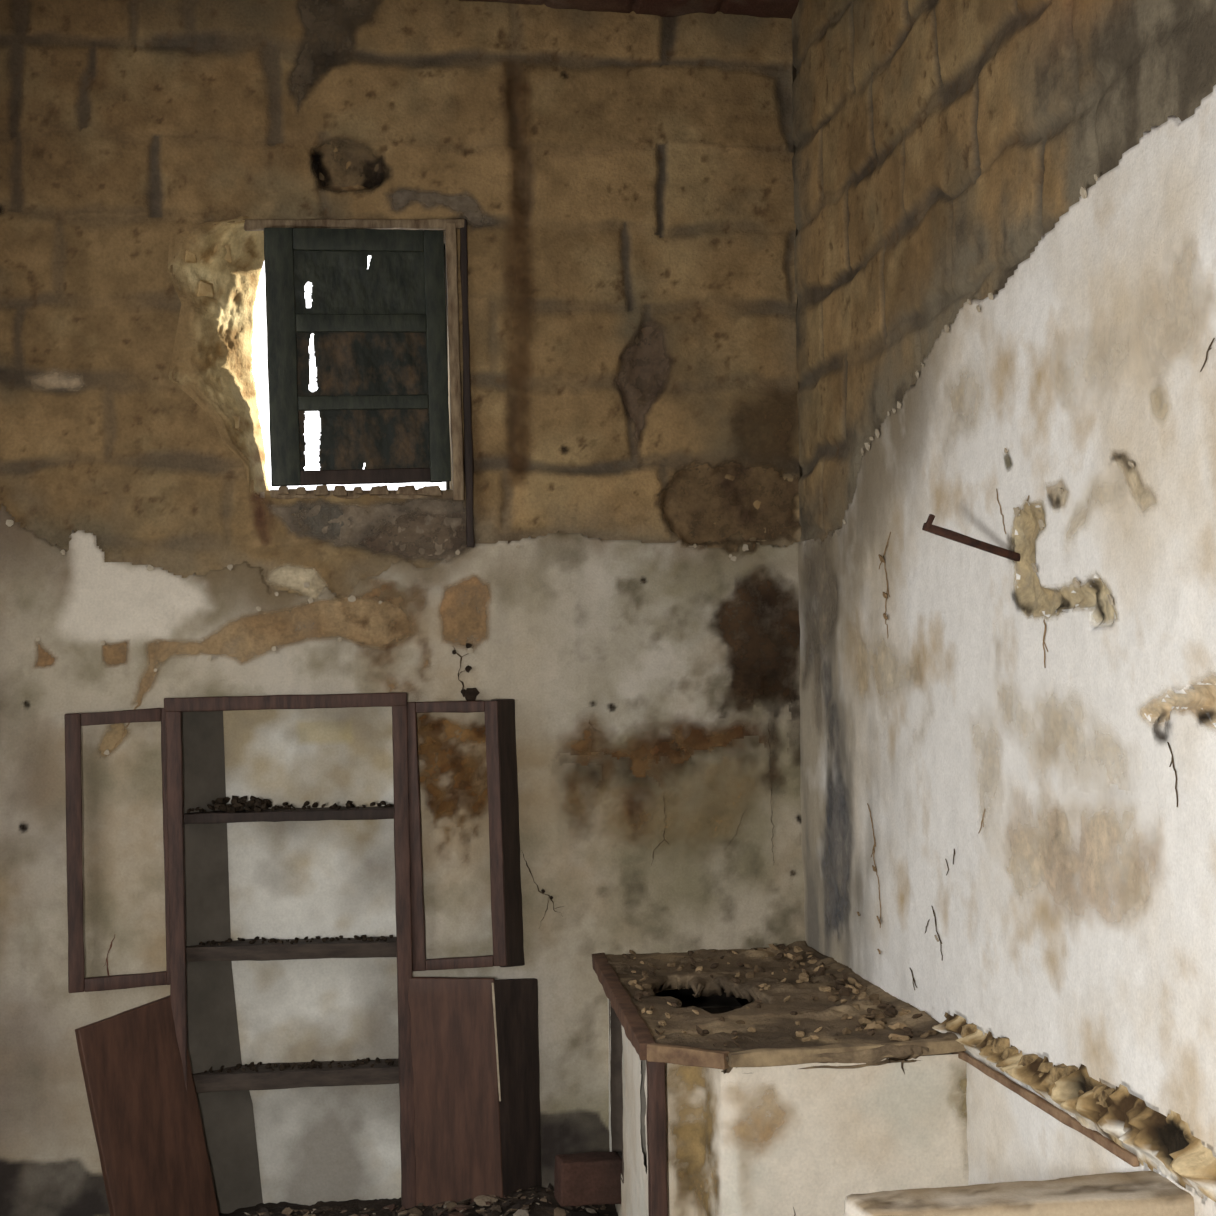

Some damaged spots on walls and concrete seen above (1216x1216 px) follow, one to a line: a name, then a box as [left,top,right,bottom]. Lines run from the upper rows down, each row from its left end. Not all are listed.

peeling [0,0,1216,758]
water stain [596,547,838,837]
water stain [822,780,850,930]
spalling [1159,1126,1189,1161]